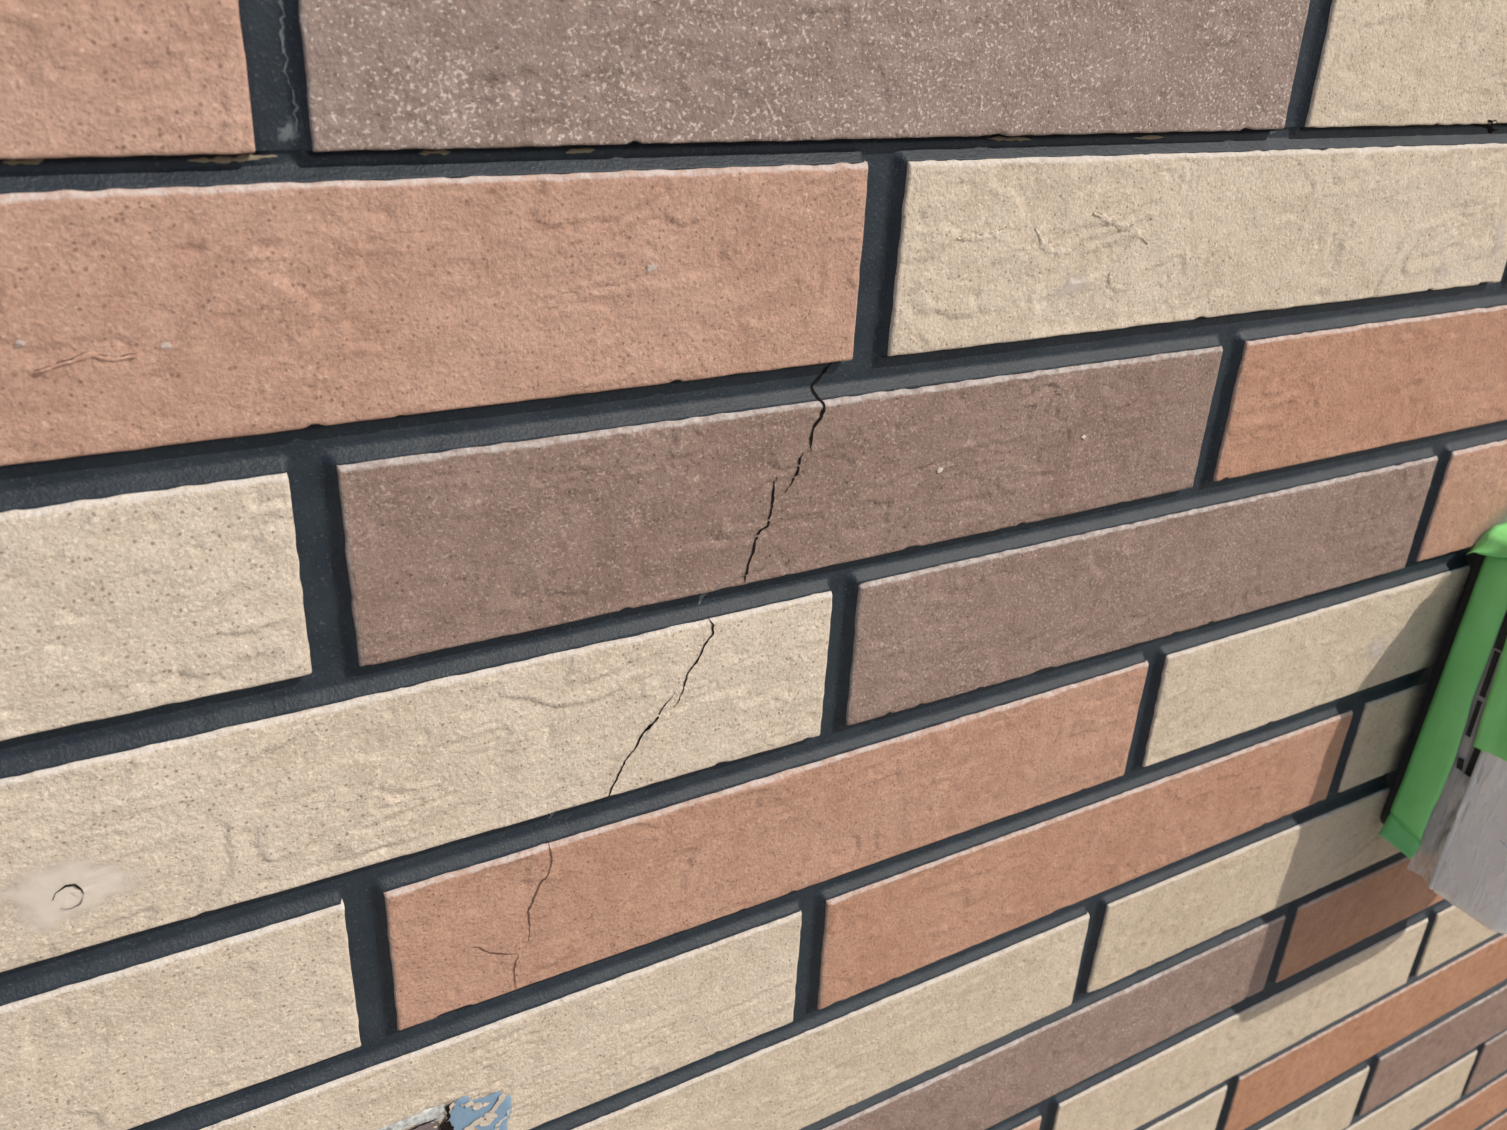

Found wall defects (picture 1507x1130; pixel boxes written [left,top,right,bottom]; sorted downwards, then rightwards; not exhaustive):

crack [744,362,832,583]
crack [608,618,714,797]
crack [472,839,553,986]
spalling [378,1091,512,1130]